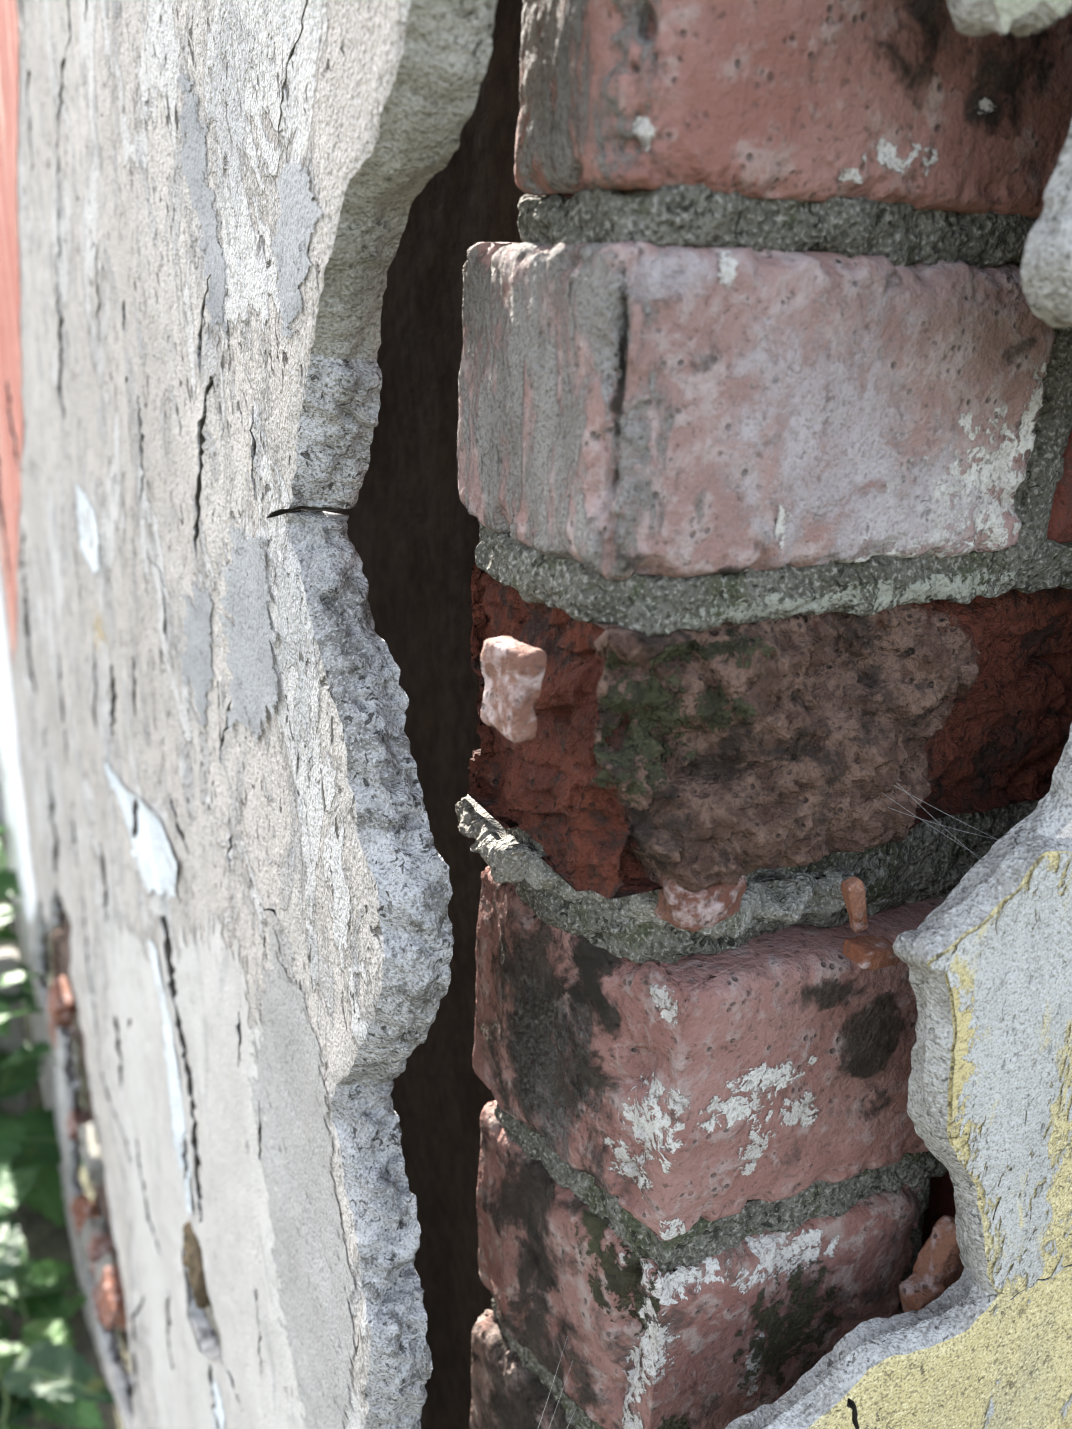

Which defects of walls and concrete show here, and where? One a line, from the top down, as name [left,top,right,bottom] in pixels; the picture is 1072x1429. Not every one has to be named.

crack [195,301,214,550]
crack [268,506,341,518]
peeling [942,404,1036,557]
crack [0,499,160,1253]
peeling [105,762,177,898]
spalling [468,562,1072,899]
crack [161,915,203,1222]
peeling [51,896,355,1429]
water stain [497,932,818,1198]
water stain [657,1217,686,1241]
peeling [930,853,1072,1310]
crack [847,1398,859,1429]